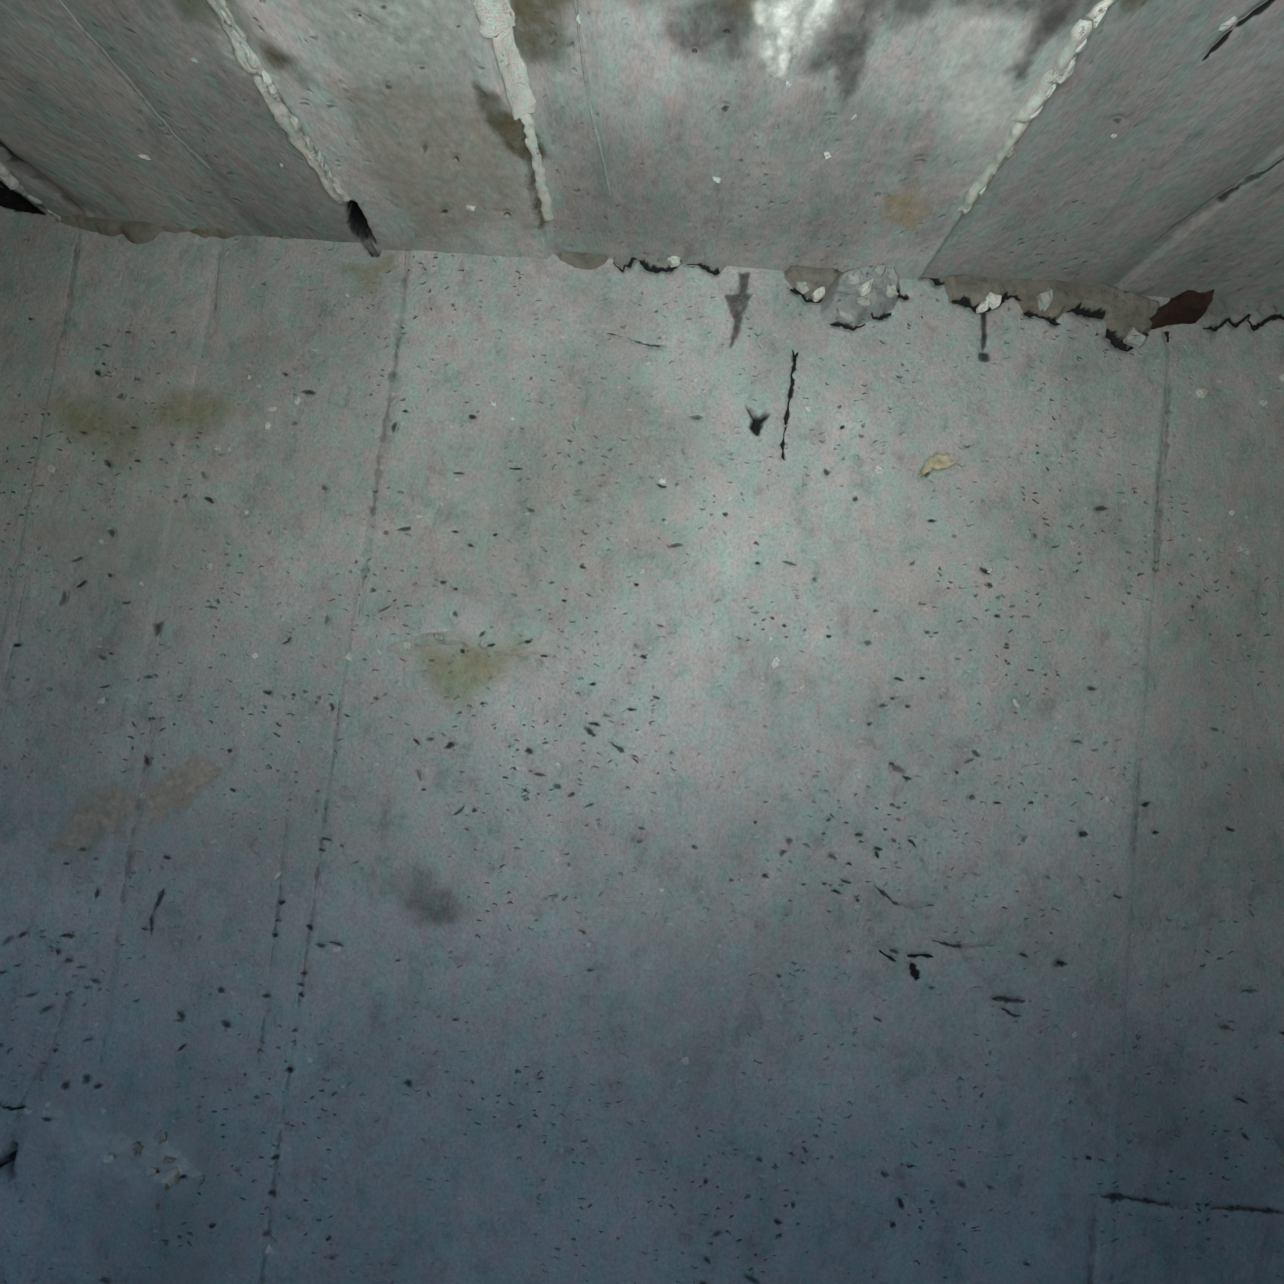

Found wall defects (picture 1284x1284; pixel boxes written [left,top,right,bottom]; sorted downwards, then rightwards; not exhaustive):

leakage [510,0,564,58]
leakage [682,0,867,93]
crack [1203,0,1275,60]
peeling [667,256,680,267]
spalling [783,266,898,324]
crack [790,277,1169,352]
peeling [976,292,1002,314]
peeling [1036,287,1053,312]
peeling [1123,327,1146,349]
crack [1203,314,1284,332]
crack [780,350,798,460]
crack [0,1151,16,1168]